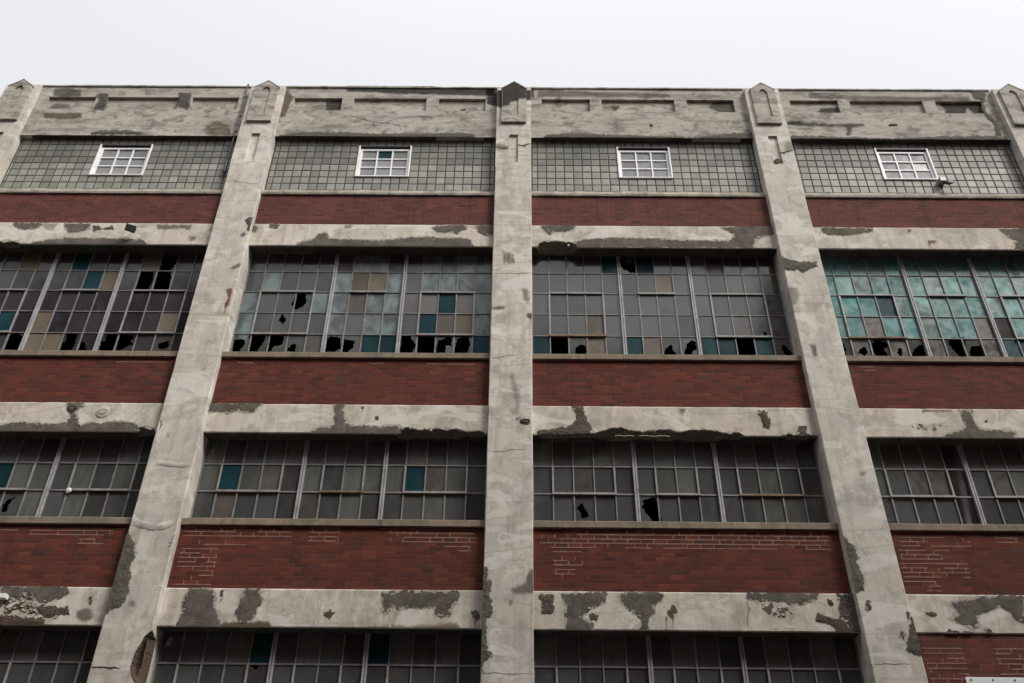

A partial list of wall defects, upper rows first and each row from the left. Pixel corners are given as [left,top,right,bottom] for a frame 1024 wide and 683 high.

peeling [310,404,488,440]
spalling [520,406,744,442]
peeling [0,586,70,625]
peeling [104,532,136,618]
peeling [172,527,292,627]
peeling [379,589,460,618]
peeling [471,566,495,673]
peeling [539,591,664,630]
peeling [746,536,872,632]
peeling [926,595,1024,634]
spalling [131,631,156,683]